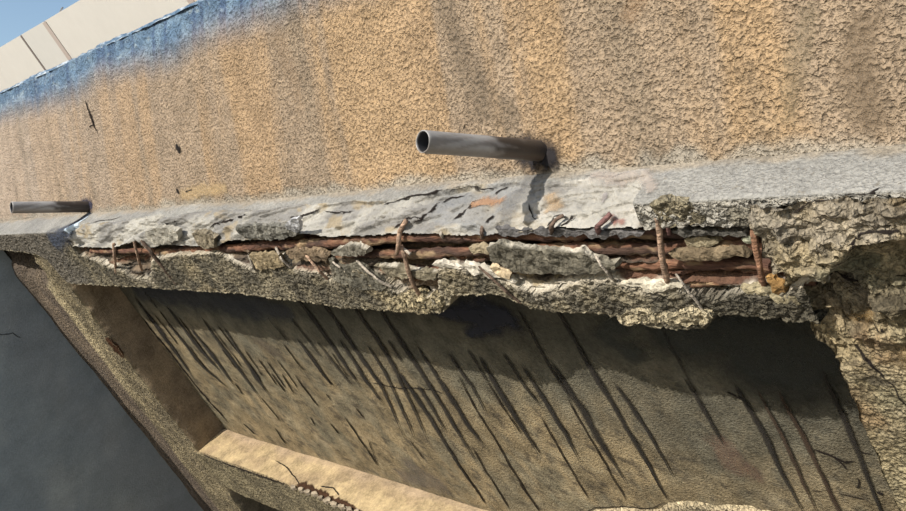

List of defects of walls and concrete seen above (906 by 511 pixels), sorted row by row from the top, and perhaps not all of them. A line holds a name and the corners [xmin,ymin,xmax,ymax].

crack [85,102,97,131]
spalling [69,170,906,385]
crack [142,311,378,484]
leakage [432,298,628,486]
crack [457,376,667,511]
crack [812,450,883,500]
crack [855,345,906,406]